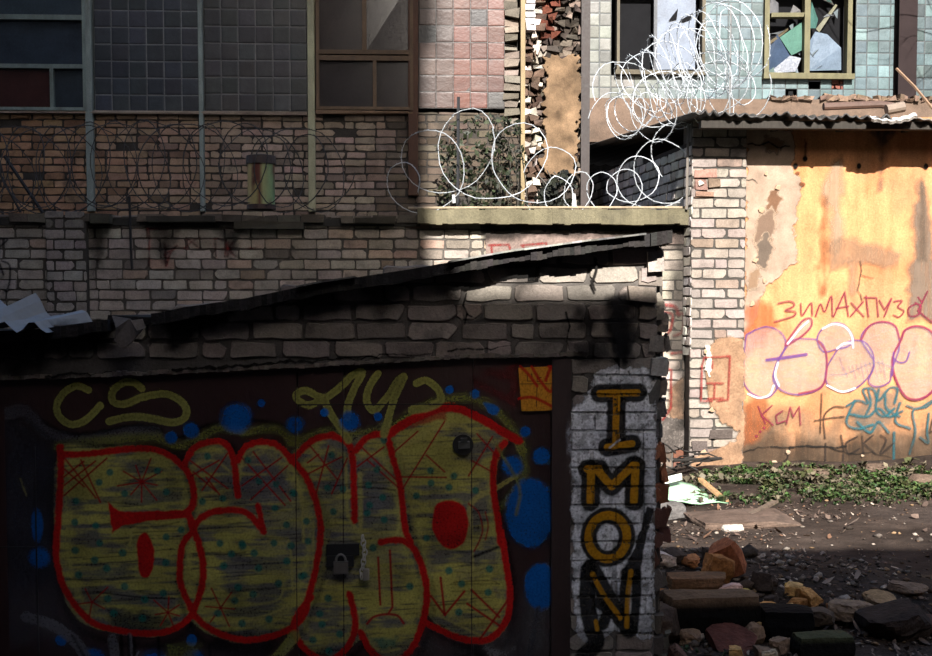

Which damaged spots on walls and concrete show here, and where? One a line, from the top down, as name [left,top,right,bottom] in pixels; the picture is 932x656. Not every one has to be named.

peeling [485,232,619,254]
spalling [627,252,665,320]
peeling [647,130,805,467]
damp [822,160,899,292]
damp [909,182,932,320]